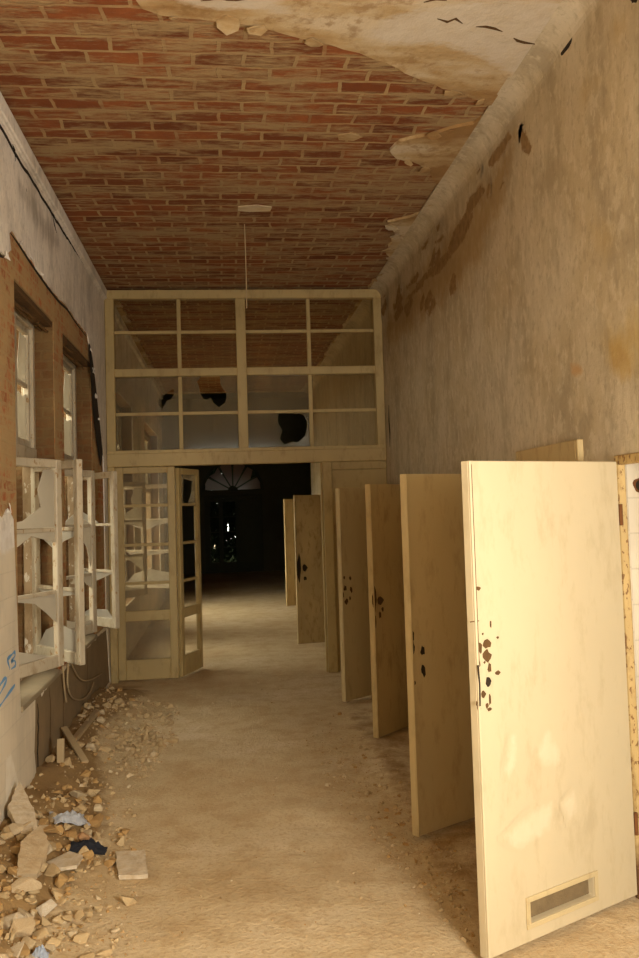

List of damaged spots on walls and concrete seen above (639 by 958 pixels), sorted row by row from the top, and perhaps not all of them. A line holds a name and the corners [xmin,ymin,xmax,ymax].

crack [561,38,572,56]
crack [0,125,79,257]
spalling [0,0,562,393]
leakage [597,296,639,390]
flaking render [0,231,105,620]